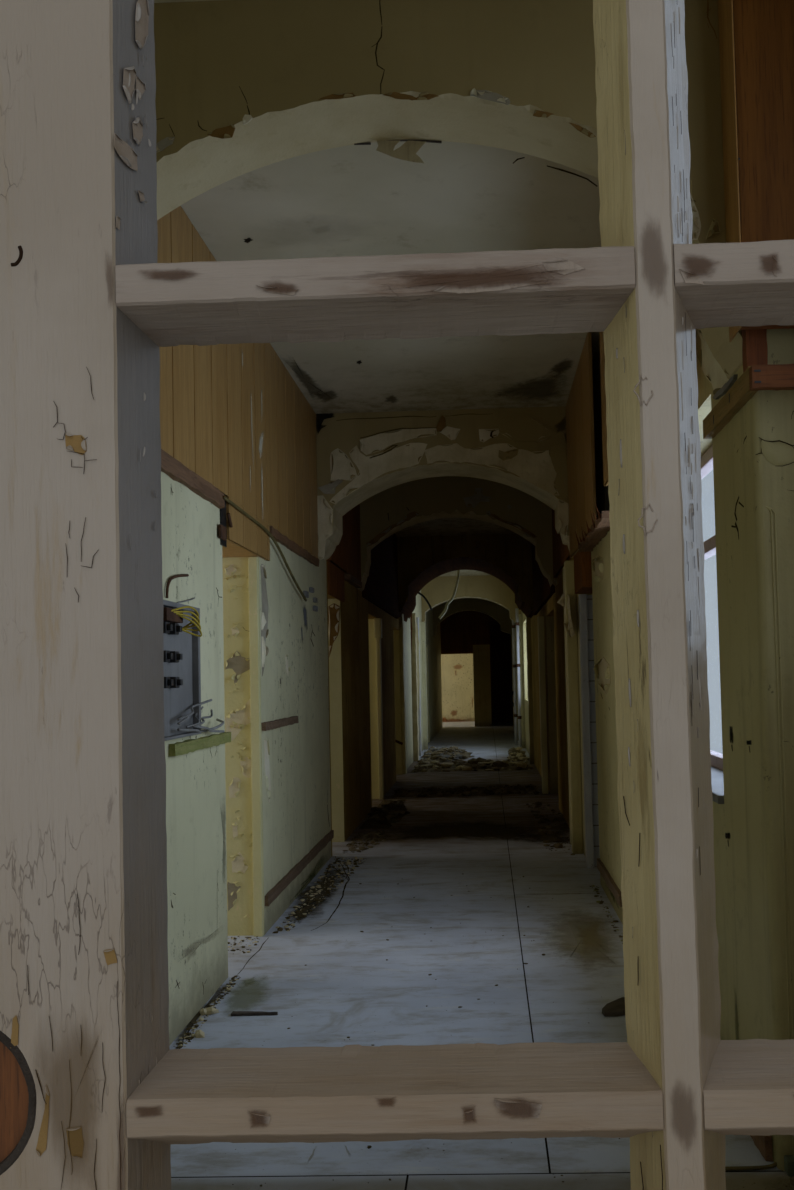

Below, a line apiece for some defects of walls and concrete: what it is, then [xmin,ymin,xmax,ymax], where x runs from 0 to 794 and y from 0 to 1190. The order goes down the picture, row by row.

peeling [135,0,149,50]
crack [372,0,385,94]
peeling [115,66,151,147]
flaking render [207,114,252,139]
peeling [383,92,438,100]
flaking render [317,416,569,561]
peeling [224,564,269,694]
flaking render [227,810,253,911]